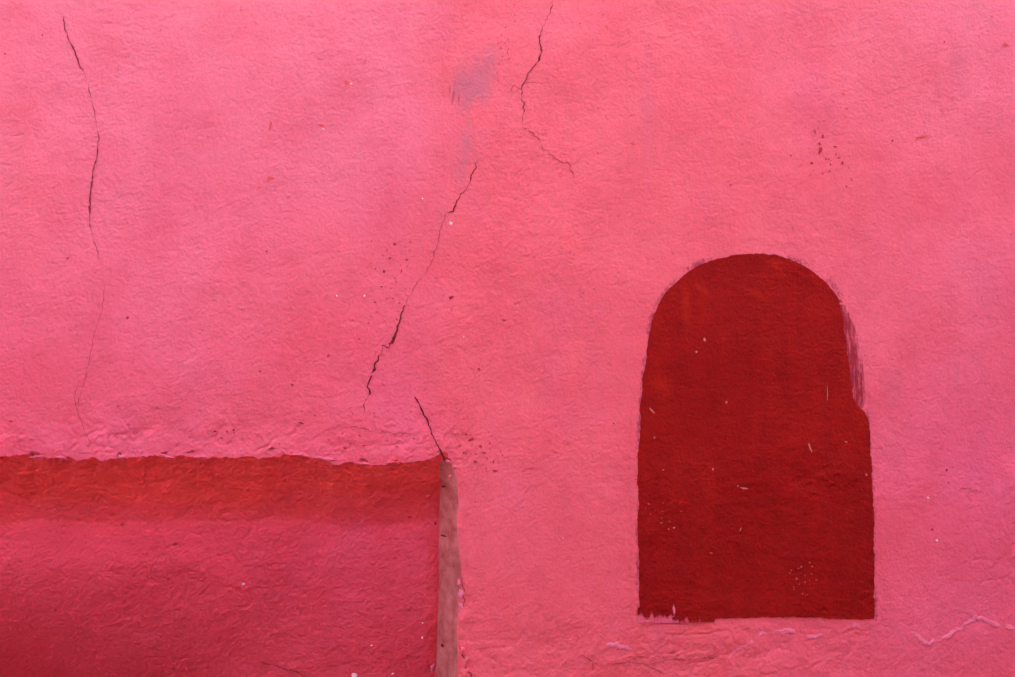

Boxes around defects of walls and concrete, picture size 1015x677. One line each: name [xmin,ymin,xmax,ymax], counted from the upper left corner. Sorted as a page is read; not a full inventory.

crack [63,16,105,442]
crack [336,163,477,462]
crack [511,0,576,185]